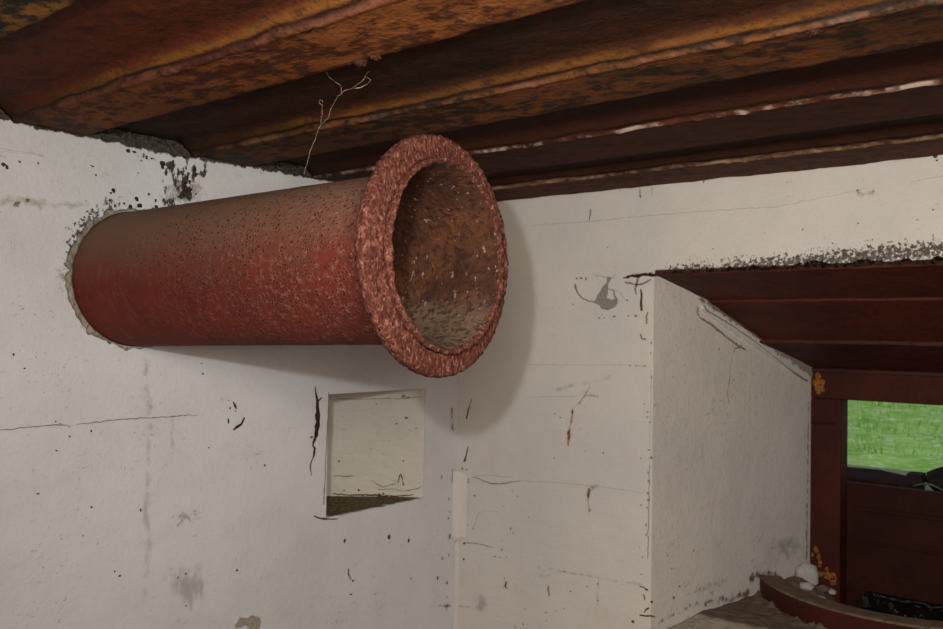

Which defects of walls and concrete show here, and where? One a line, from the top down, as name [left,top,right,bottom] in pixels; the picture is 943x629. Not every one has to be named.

spalling [572,277,628,319]
corrosion [812,372,825,395]
crack [0,414,197,430]
crack [310,386,419,476]
corrosion [811,546,838,585]
peeling [234,613,262,629]